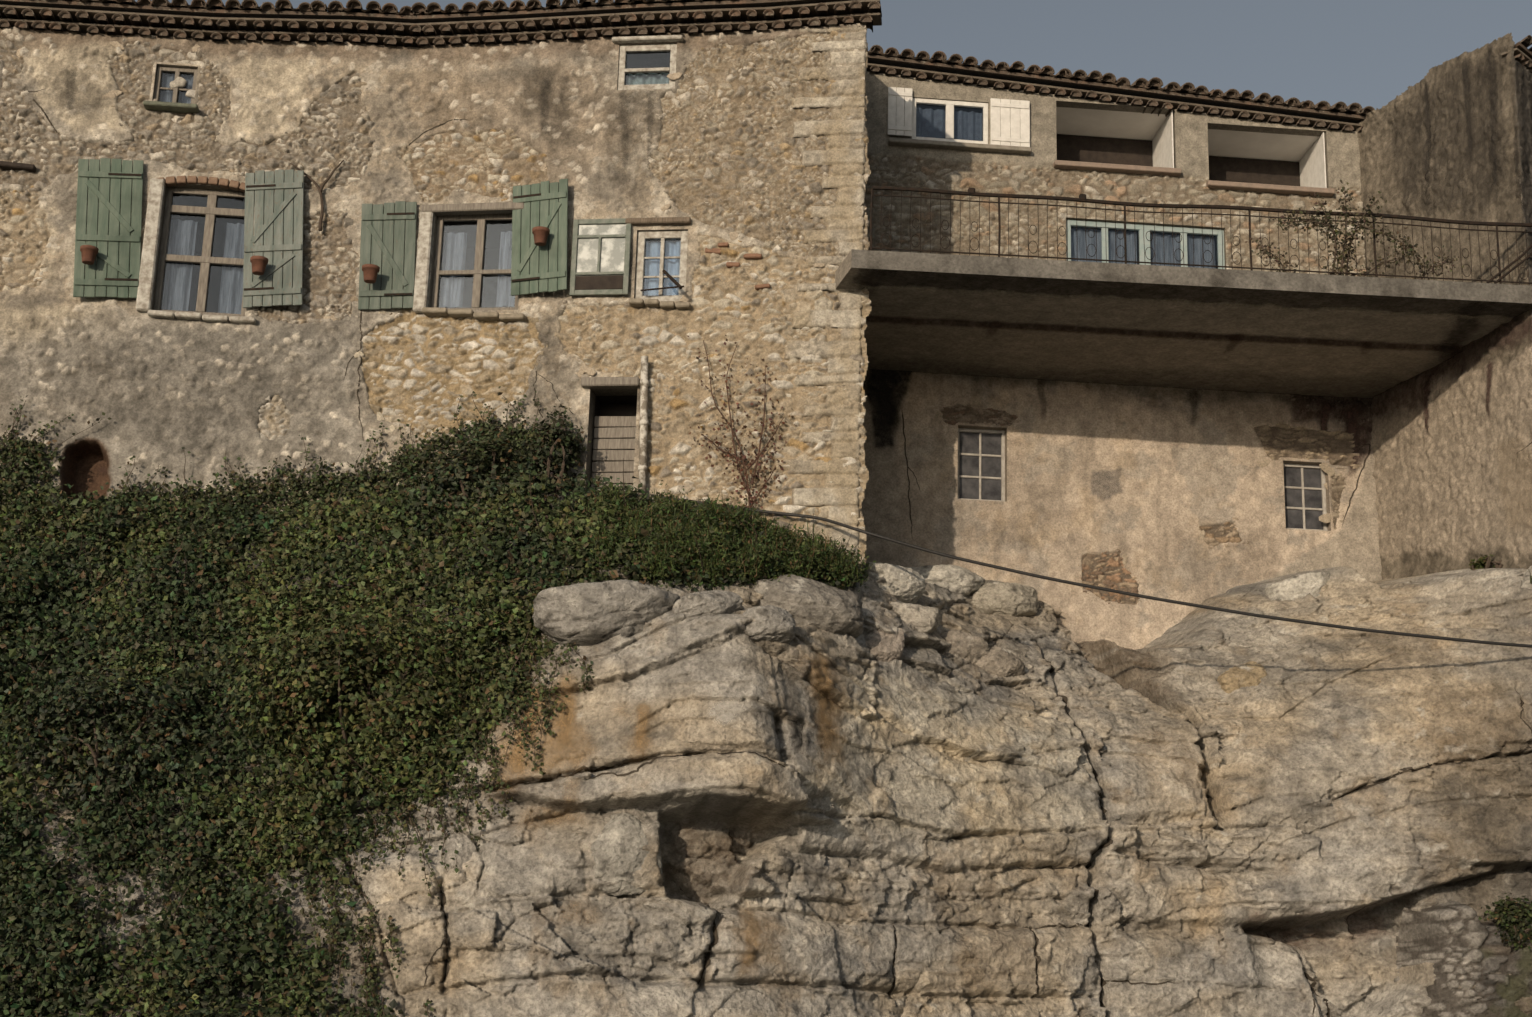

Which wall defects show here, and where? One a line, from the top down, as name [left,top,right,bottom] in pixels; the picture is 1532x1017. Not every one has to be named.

flaking render [0,23,871,567]
damp [854,268,1532,467]
spalling [935,395,1021,426]
spalling [1253,420,1360,530]
crack [1342,442,1371,526]
spalling [1199,518,1249,549]
spalling [1078,549,1141,605]